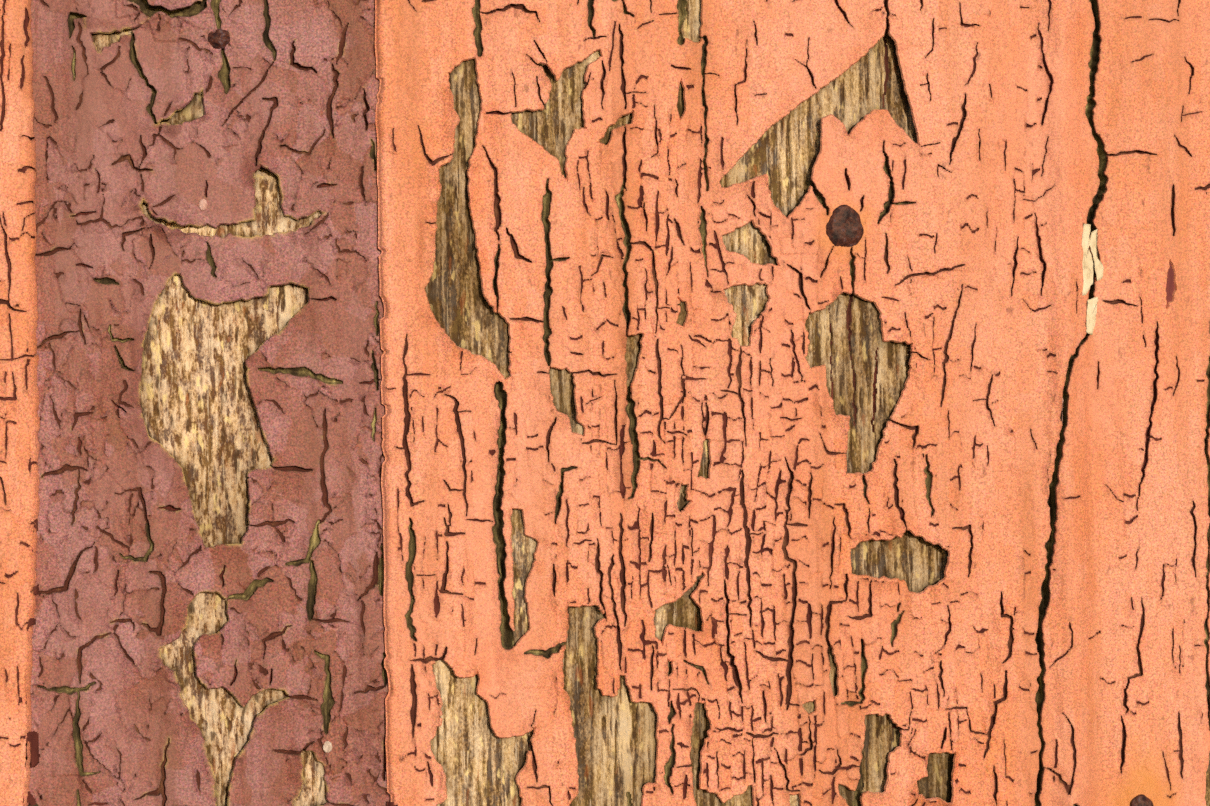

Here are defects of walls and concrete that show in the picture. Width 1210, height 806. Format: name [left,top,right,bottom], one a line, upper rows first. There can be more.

peeling [417,39,701,389]
peeling [700,0,938,347]
crack [1106,57,1200,157]
crack [1171,184,1210,236]
peeling [119,146,338,806]
peeling [805,280,929,485]
crack [1076,279,1204,524]
peeling [424,496,769,806]
peeling [821,700,969,806]
rust [1087,714,1189,806]
crack [1100,501,1196,772]
crack [1162,712,1184,798]